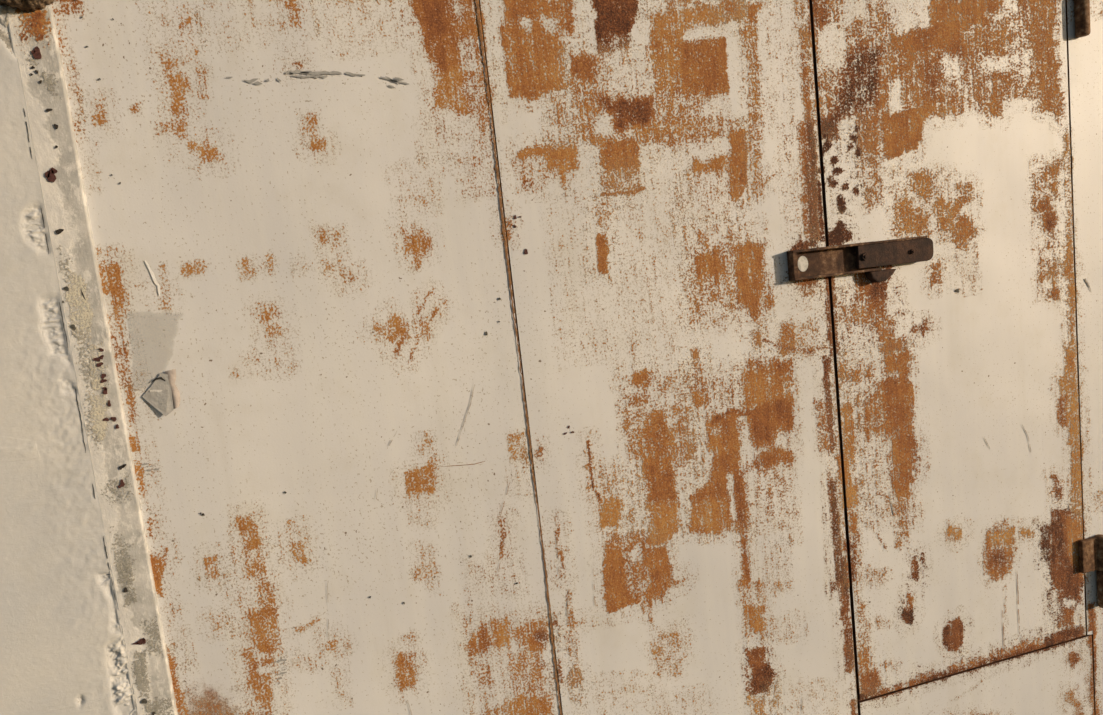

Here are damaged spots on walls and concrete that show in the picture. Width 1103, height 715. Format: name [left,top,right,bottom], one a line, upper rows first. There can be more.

rust [144,0,249,179]
rust [96,246,352,715]
rust [238,0,1103,715]